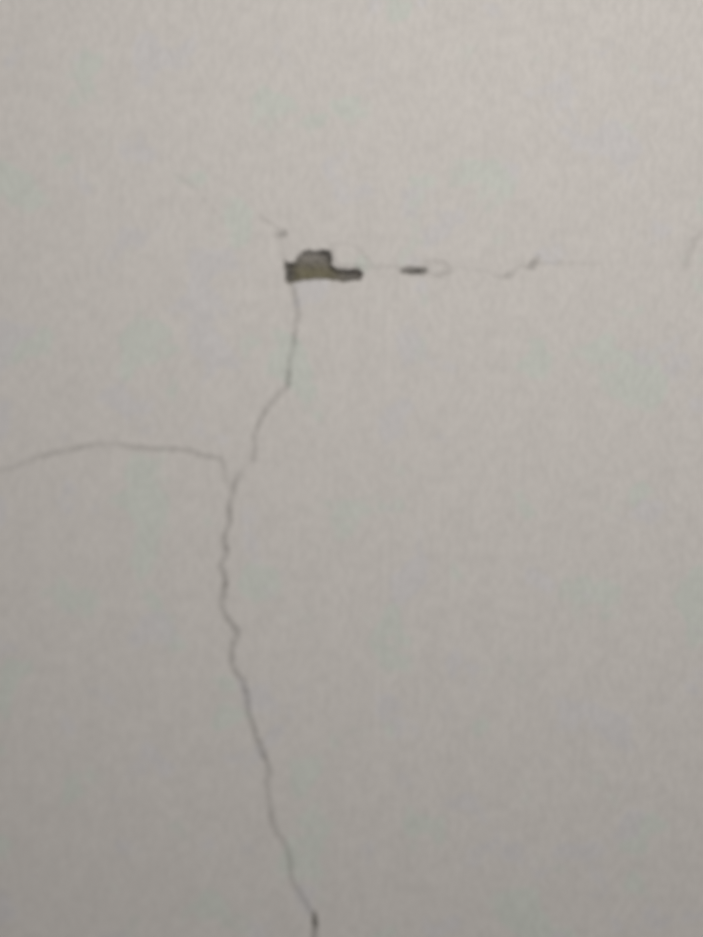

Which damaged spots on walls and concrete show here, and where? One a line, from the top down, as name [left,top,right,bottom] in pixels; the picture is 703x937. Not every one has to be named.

crack [254,211,291,263]
flaking render [281,238,375,288]
crack [367,198,604,284]
crack [0,285,320,937]